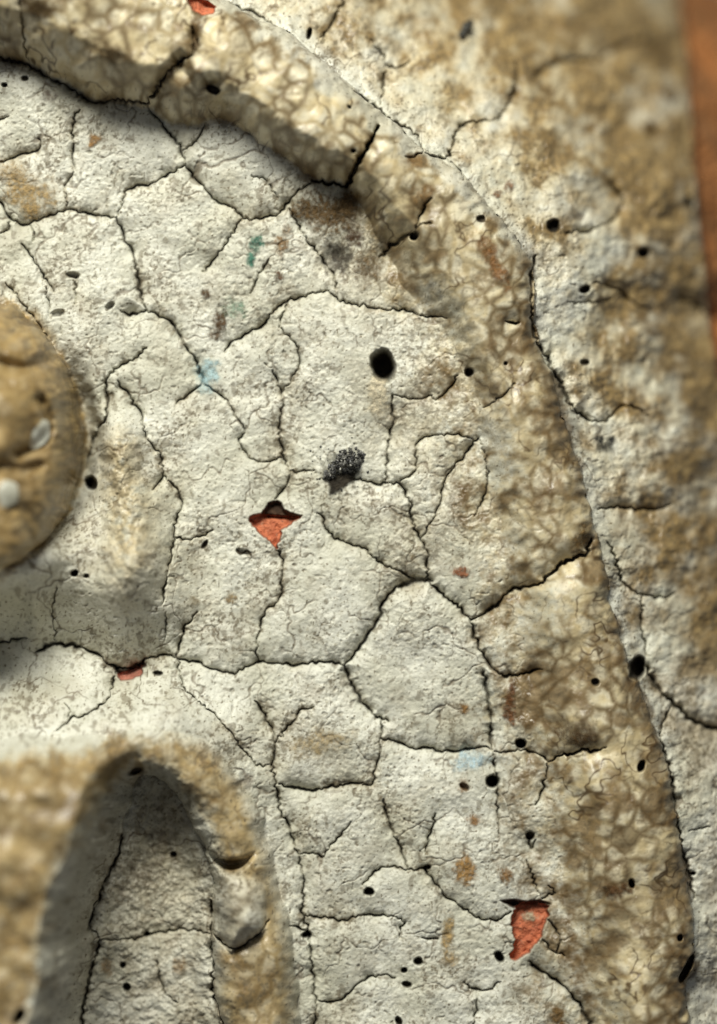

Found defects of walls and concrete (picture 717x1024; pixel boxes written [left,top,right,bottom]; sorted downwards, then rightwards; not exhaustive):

peeling [187,0,215,15]
crack [0,2,646,497]
peeling [249,500,301,549]
peeling [116,661,147,680]
crack [0,348,716,1024]
peeling [495,899,550,961]